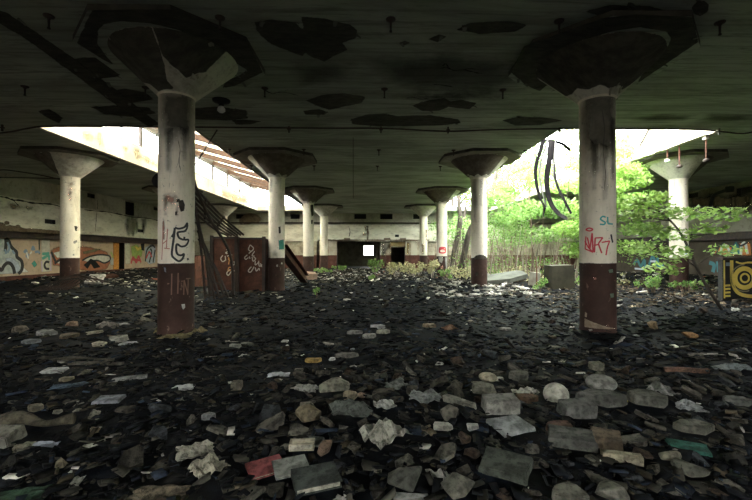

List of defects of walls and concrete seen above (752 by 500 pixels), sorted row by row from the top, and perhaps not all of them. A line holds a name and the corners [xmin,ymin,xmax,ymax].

peeling [0,9,263,126]
peeling [255,17,361,62]
peeling [457,21,526,34]
peeling [511,0,709,96]
leakage [161,93,193,168]
peeling [304,93,365,118]
peeling [350,98,477,127]
leakage [584,96,616,162]